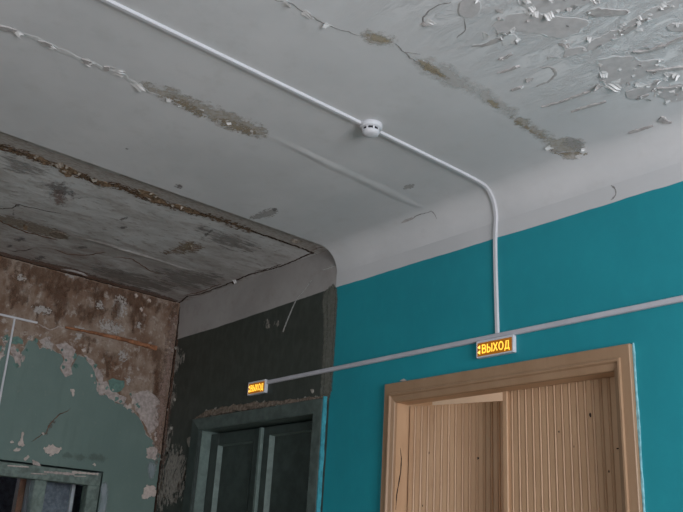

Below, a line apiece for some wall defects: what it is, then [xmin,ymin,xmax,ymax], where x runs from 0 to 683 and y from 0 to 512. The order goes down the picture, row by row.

peeling [0,24,161,96]
crack [275,0,362,36]
leakage [361,31,392,45]
leakage [420,61,449,79]
crack [420,2,451,27]
peeling [472,0,683,108]
leakage [142,82,268,138]
leakage [510,117,587,159]
crack [0,144,322,512]
peeling [0,256,191,512]
flaking render [195,389,324,419]